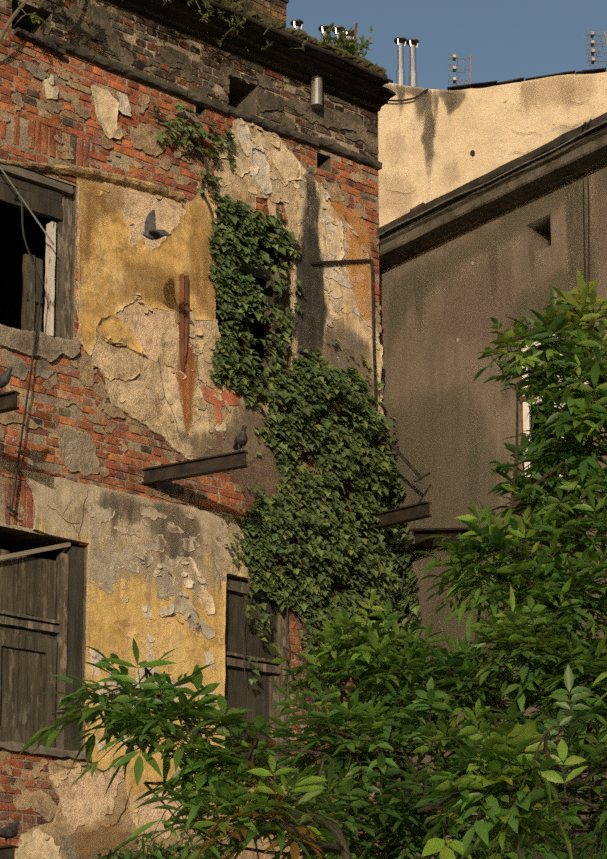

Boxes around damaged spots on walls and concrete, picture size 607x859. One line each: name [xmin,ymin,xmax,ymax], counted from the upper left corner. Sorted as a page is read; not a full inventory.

water stain [383,84,465,158]
flaking render [0,27,382,350]
water stain [294,169,371,410]
rust [178,344,195,430]
flaking render [0,291,244,709]
water stain [100,493,144,533]
water stain [90,506,211,601]
peeling [91,717,130,752]
flaking render [0,750,124,859]
flaking render [128,788,189,839]